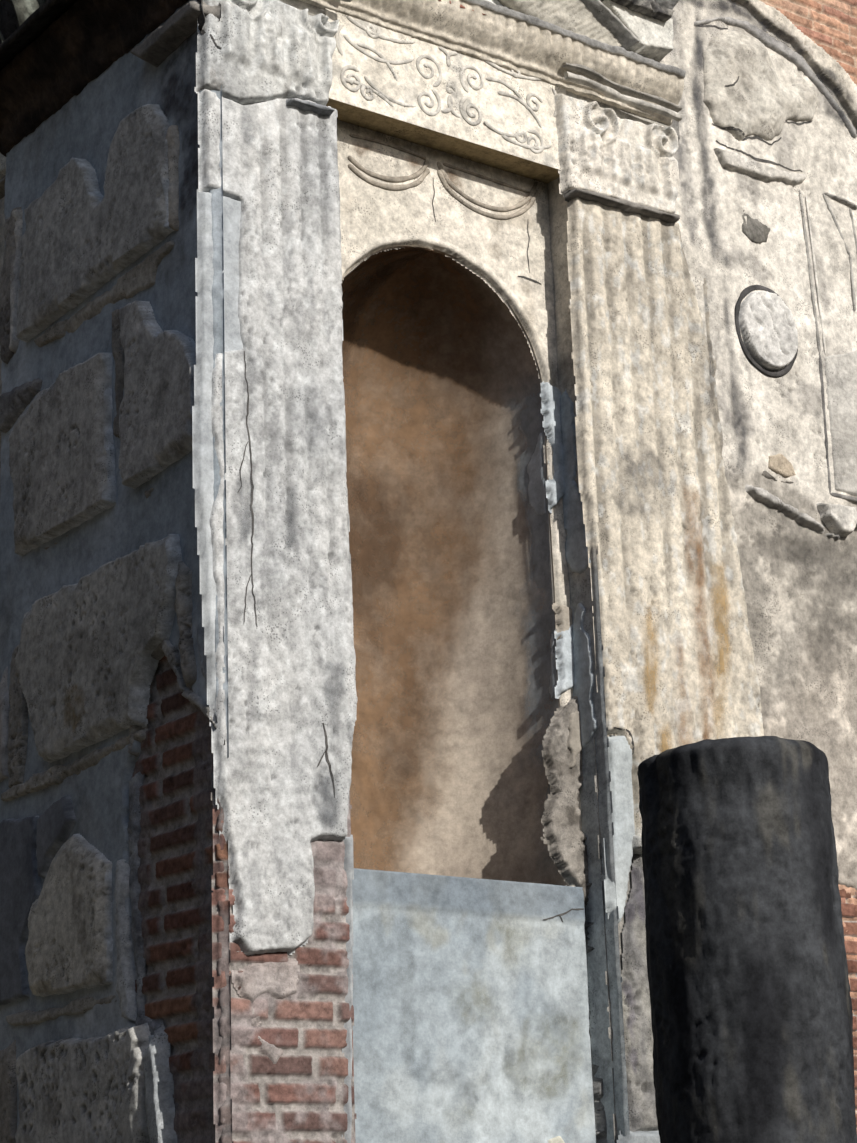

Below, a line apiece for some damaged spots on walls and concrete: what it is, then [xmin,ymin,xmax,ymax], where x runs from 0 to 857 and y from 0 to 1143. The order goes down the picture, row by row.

crack [238,351,258,627]
spalling [127,639,357,1143]
crack [317,723,335,798]
spalling [621,835,658,1132]
spalling [839,889,857,1128]